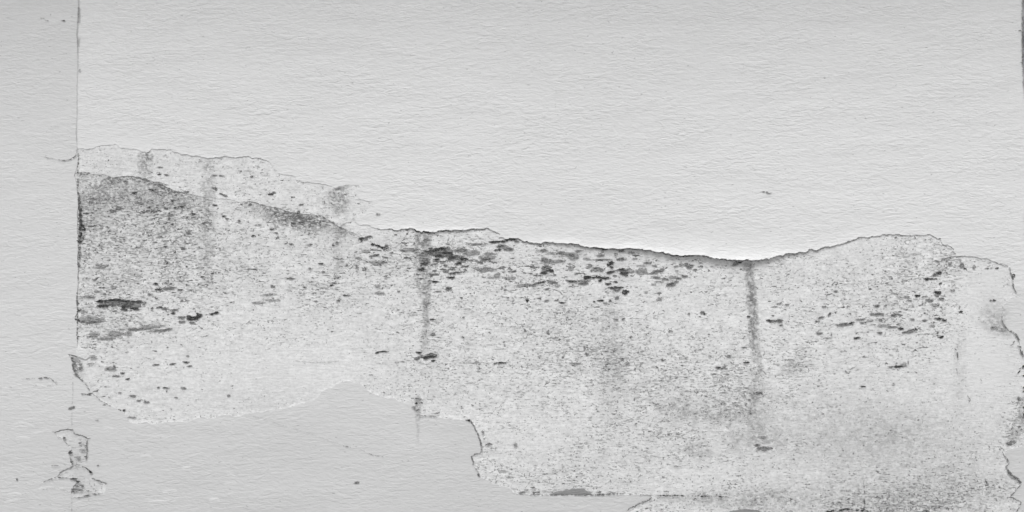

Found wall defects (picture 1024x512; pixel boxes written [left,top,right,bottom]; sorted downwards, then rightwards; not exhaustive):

peeling [69,144,1024,512]
damp [744,264,759,354]
peeling [54,429,107,497]